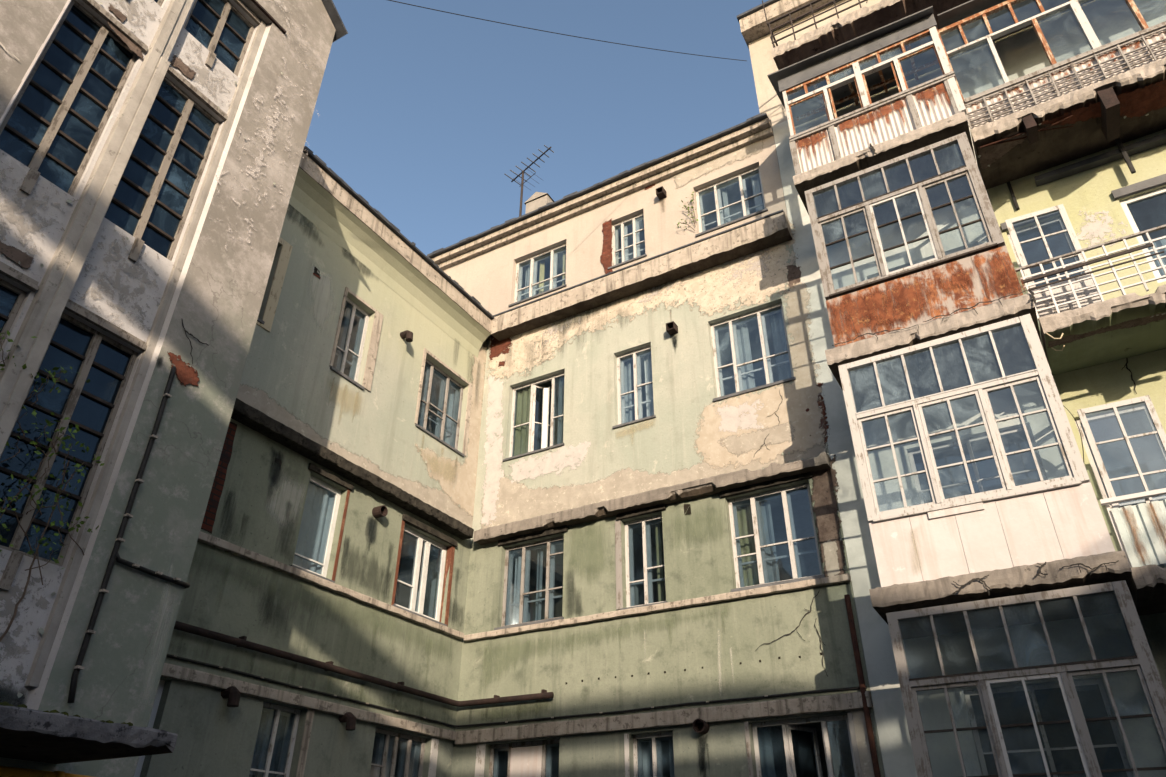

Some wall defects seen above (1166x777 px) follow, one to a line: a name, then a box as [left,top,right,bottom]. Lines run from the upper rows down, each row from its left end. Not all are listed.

corrosion [797,83,951,157]
corrosion [940,253,1026,299]
corrosion [827,279,928,341]
flaking render [167,352,200,386]
flaking render [236,218,846,585]
crack [952,575,992,595]
crack [1034,560,1119,577]
crack [755,590,828,676]